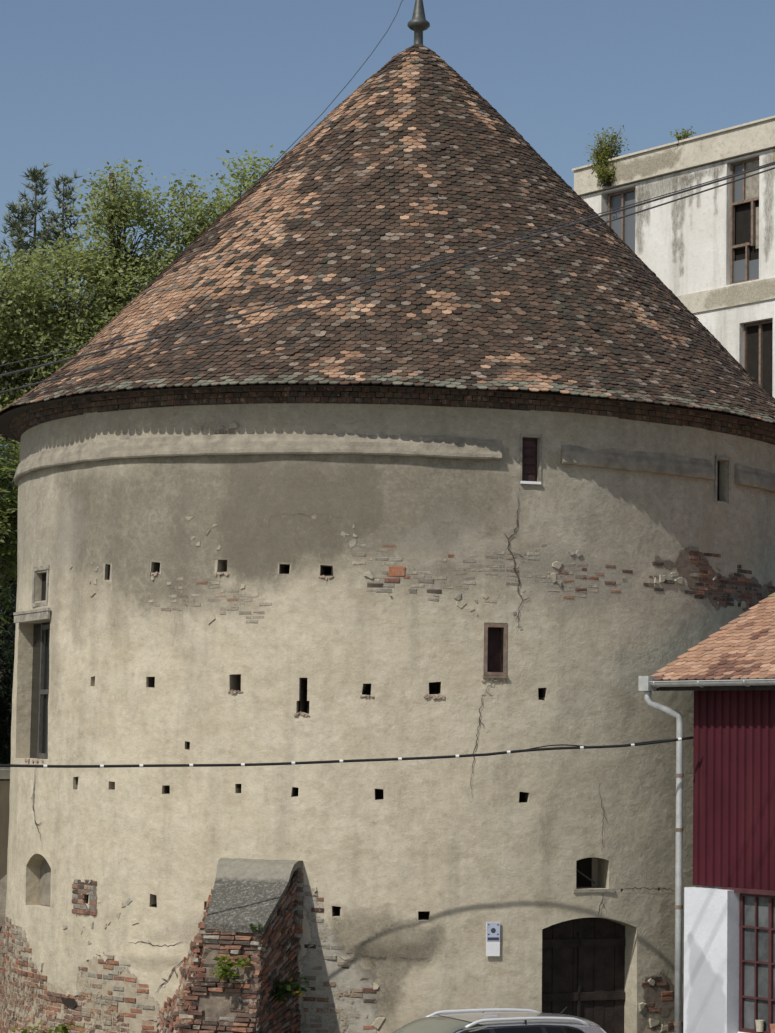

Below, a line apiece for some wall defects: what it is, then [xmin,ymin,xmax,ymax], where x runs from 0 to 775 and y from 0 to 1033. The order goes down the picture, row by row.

spalling [144,571,272,625]
spalling [339,524,633,615]
crack [505,488,529,630]
spalling [643,546,775,611]
crack [470,682,495,798]
crack [30,761,42,844]
spalling [0,876,160,1033]
spalling [638,972,683,1033]